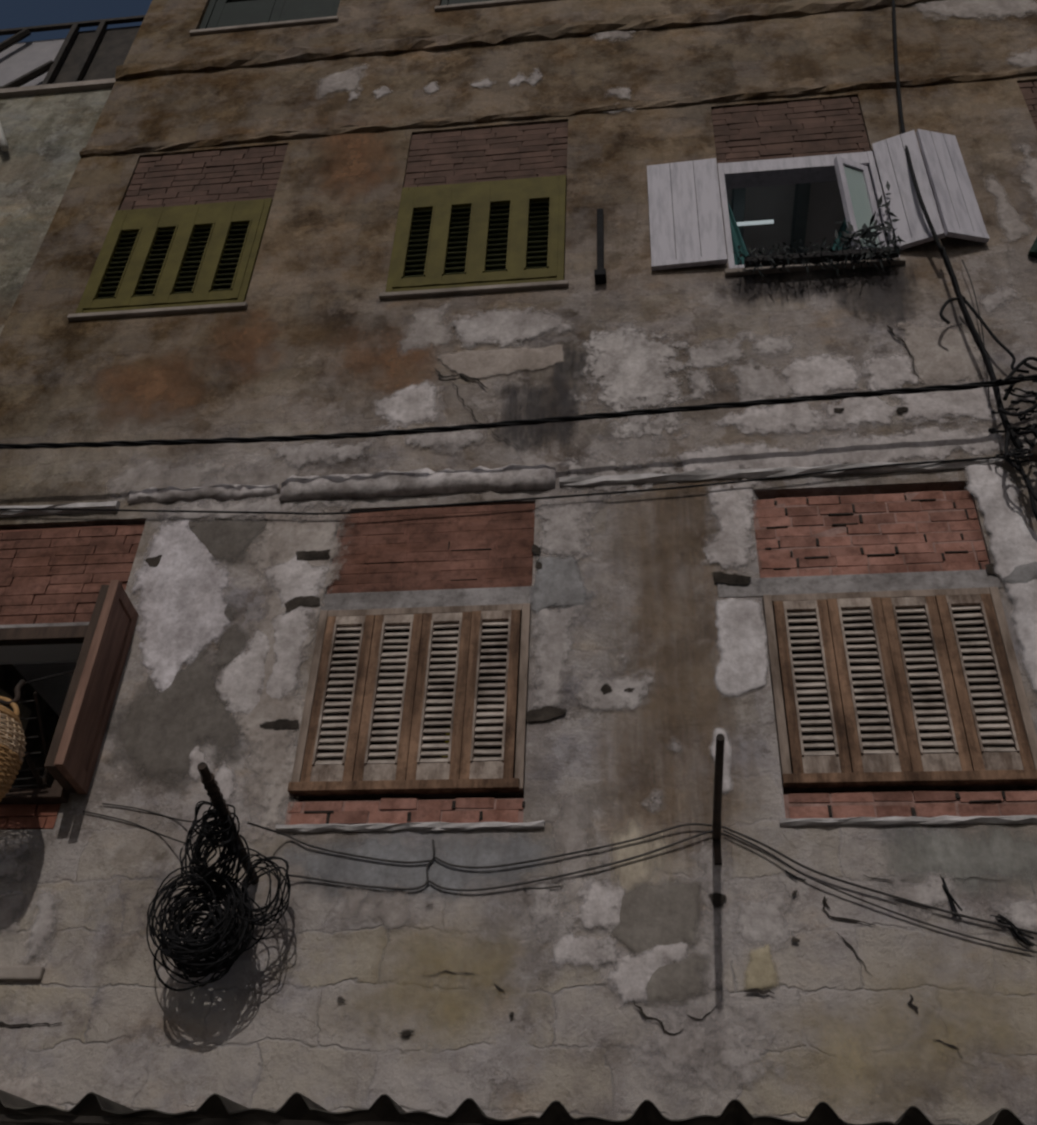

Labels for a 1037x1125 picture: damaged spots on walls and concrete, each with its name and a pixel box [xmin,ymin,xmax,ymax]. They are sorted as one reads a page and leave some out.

flaking render [399,303,571,378]
crack [887,325,924,383]
crack [435,368,525,451]
flaking render [532,320,1004,696]
flaking render [107,381,483,841]
flaking render [526,599,653,722]
flaking render [711,728,732,793]
crack [864,874,910,882]
flaking render [514,878,688,1003]
crack [822,896,874,976]
crack [634,988,775,1035]
flaking render [636,990,780,1089]